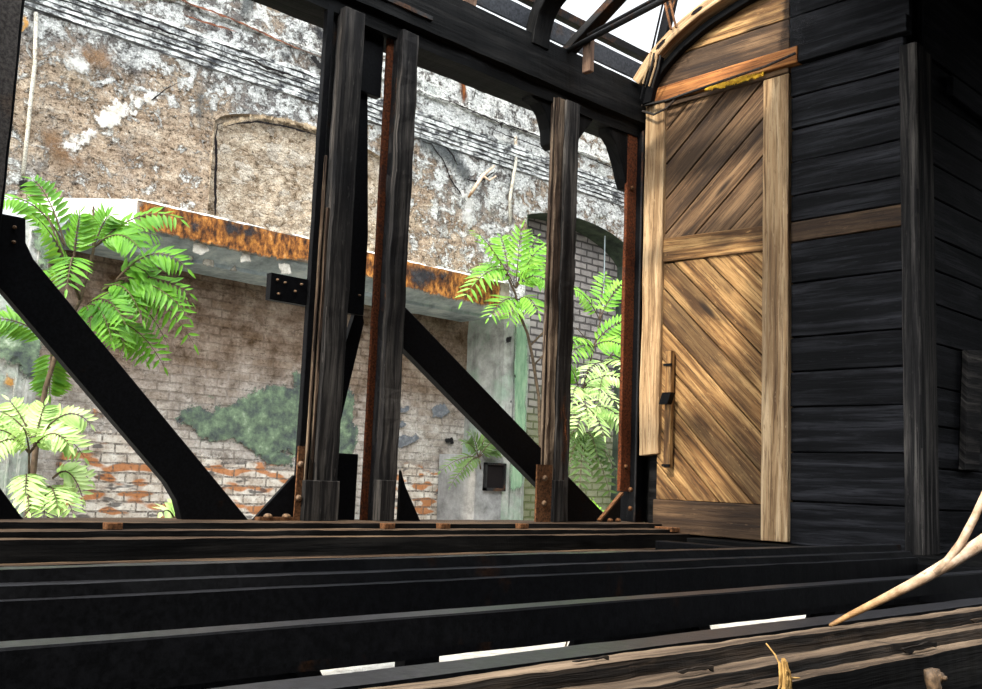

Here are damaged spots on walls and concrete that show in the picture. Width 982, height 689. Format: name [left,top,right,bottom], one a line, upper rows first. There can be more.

leakage [66,46,112,73]
leakage [44,84,161,165]
corrosion [140,202,309,260]
corrosion [366,253,374,277]
corrosion [406,262,501,308]
spalling [56,429,175,518]
peeling [175,370,301,519]
peeling [339,387,359,454]